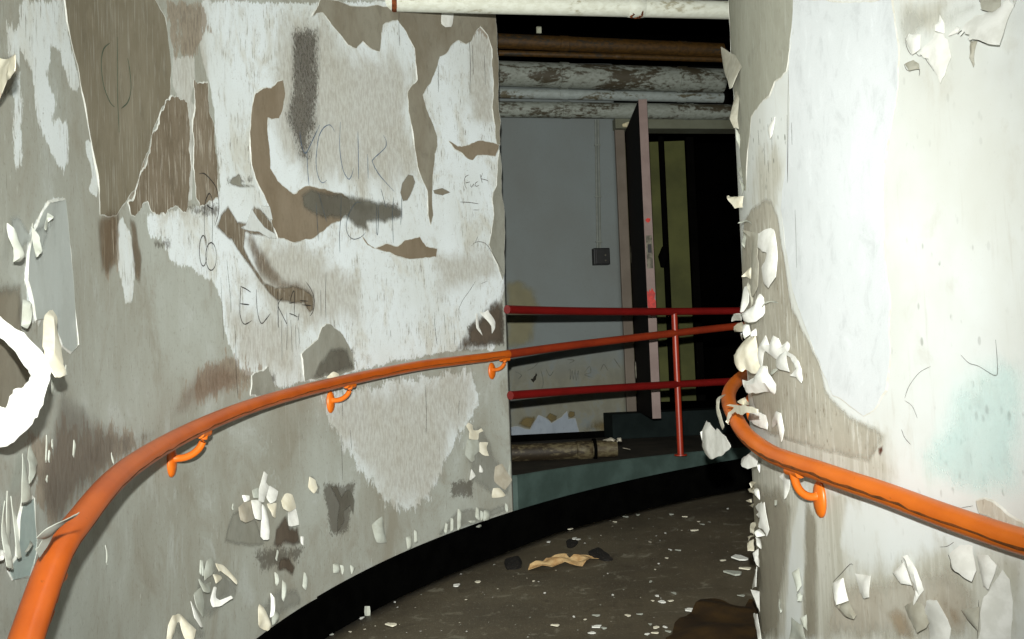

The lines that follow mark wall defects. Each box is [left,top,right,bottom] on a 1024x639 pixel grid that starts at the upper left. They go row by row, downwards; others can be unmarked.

peeling [64,0,351,311]
peeling [311,0,505,280]
peeling [0,198,79,447]
peeling [700,0,1024,639]
peeling [0,435,79,581]
peeling [45,323,512,639]